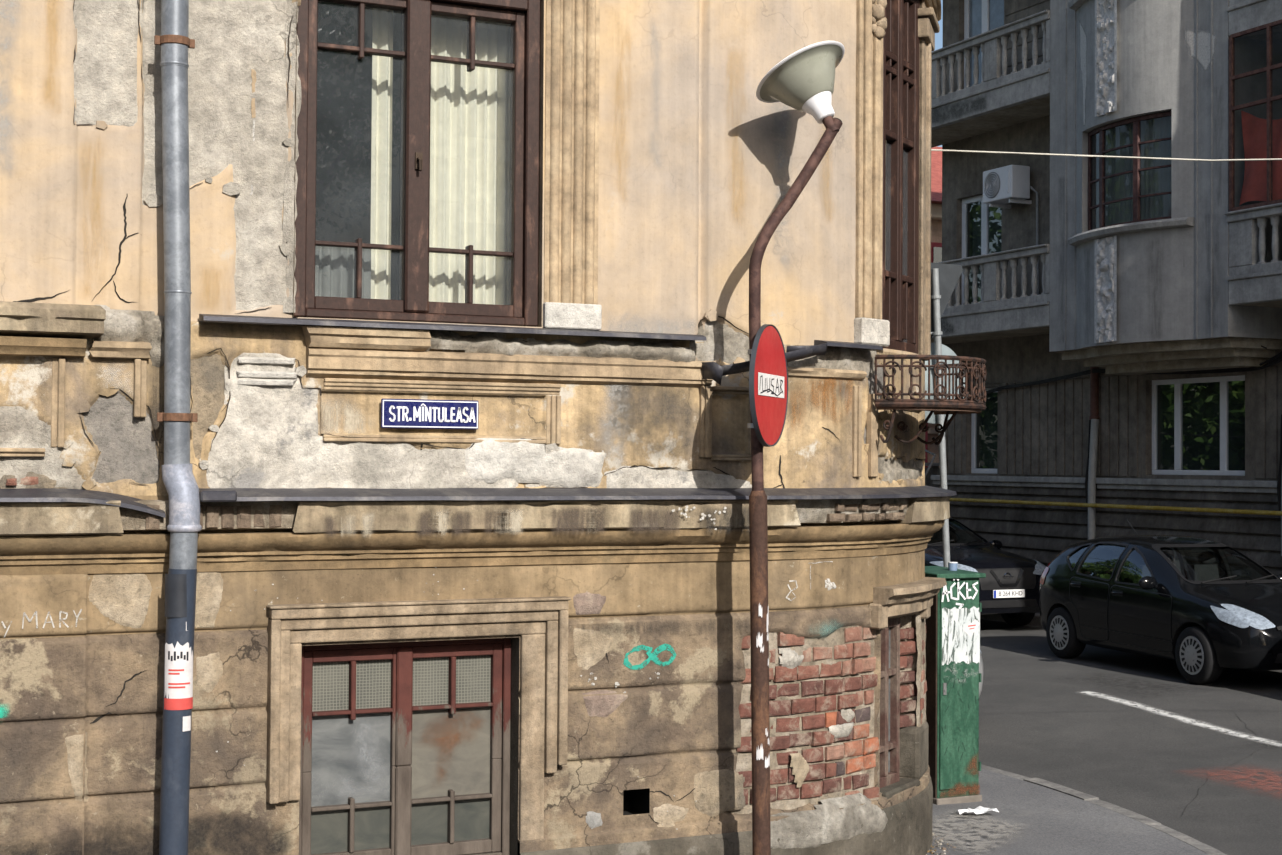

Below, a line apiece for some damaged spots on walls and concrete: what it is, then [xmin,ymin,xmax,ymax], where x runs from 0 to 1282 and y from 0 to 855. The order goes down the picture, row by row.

flaking render [73,0,163,207]
flaking render [188,0,301,314]
crack [13,194,138,303]
flaking render [0,383,161,490]
flaking render [190,348,231,470]
peeling [88,573,152,629]
crack [91,670,146,723]
peeling [653,636,752,827]
flaking render [769,625,880,810]